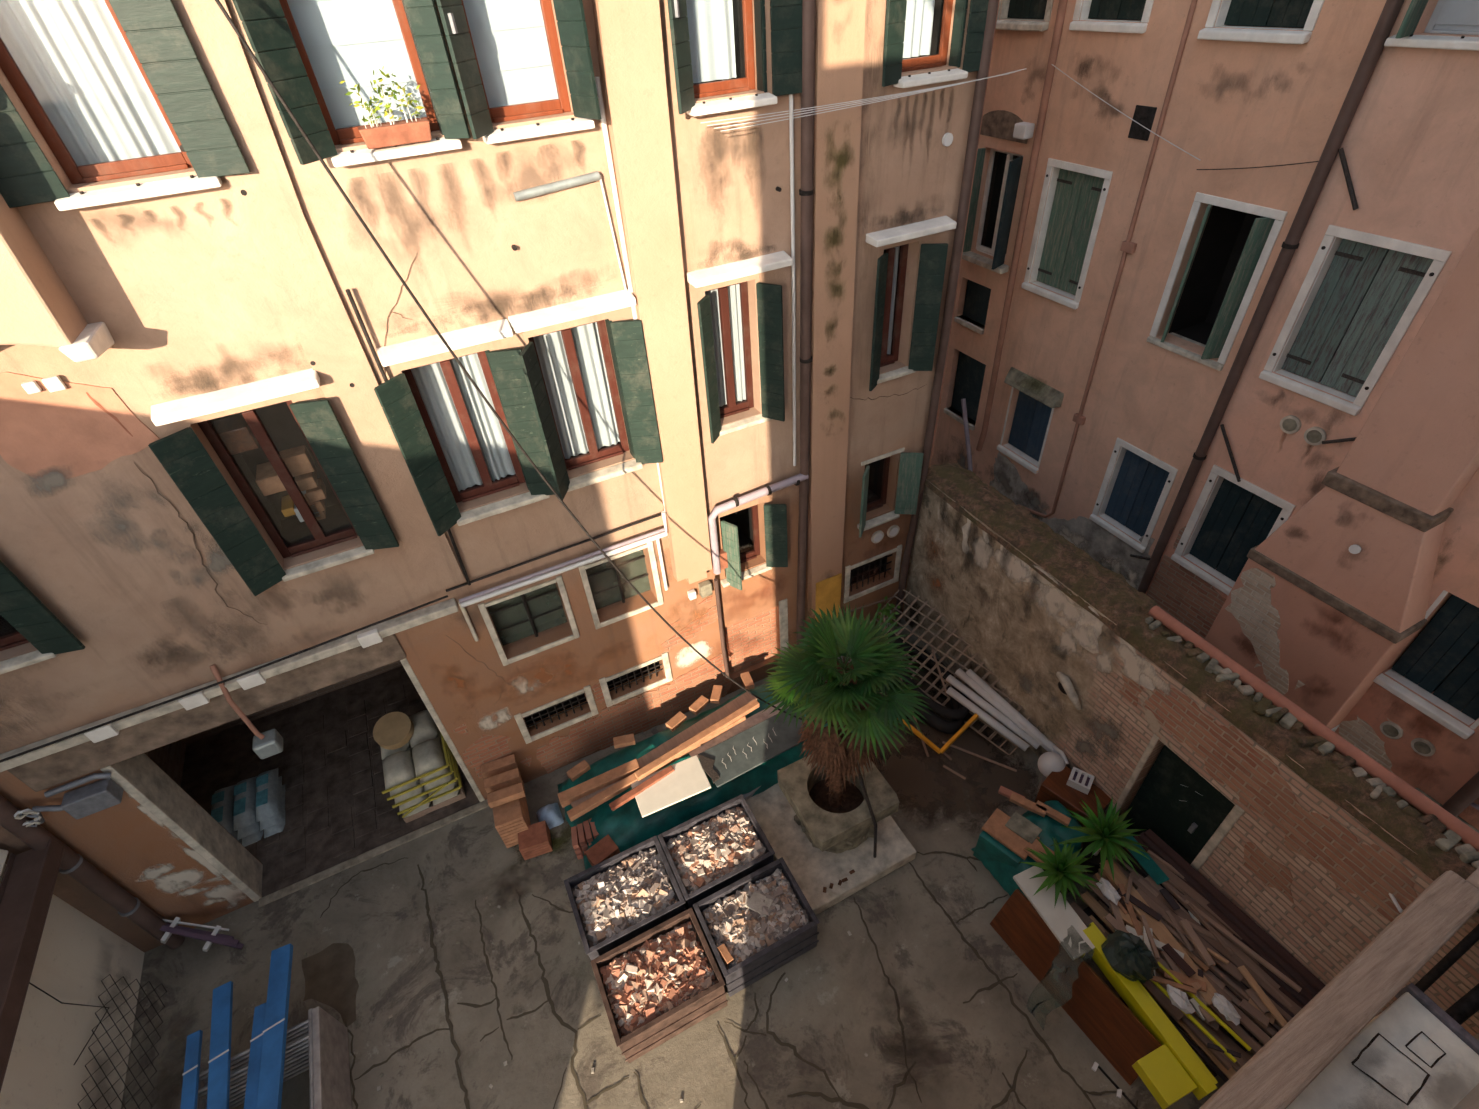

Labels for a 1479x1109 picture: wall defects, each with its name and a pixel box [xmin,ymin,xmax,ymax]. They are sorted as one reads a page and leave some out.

peeling [1139,526,1305,695]
crack [320,857,648,1109]
crack [716,897,922,1109]
crack [909,851,1138,1109]